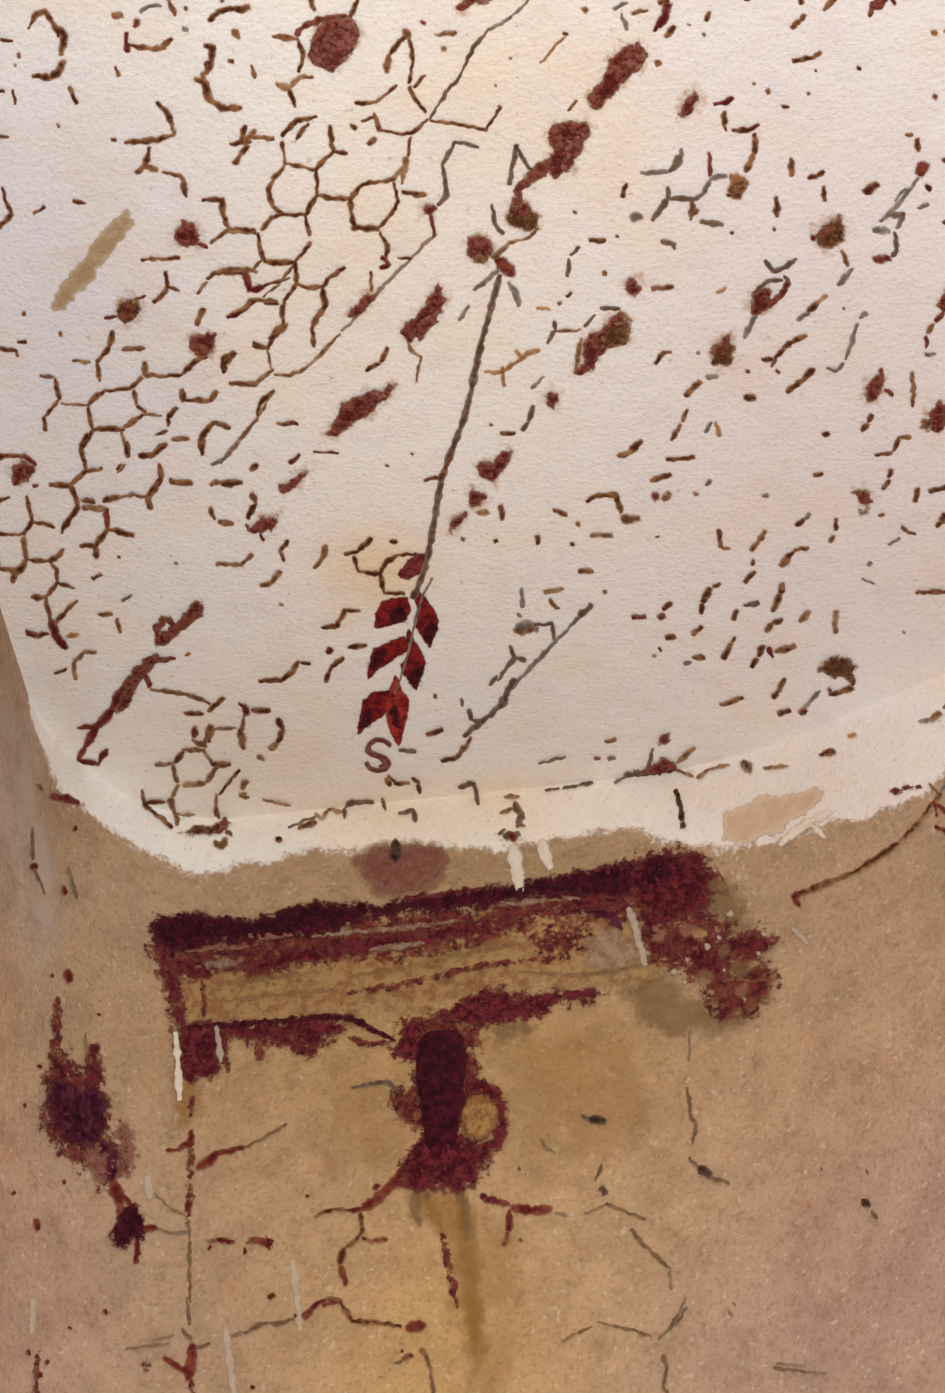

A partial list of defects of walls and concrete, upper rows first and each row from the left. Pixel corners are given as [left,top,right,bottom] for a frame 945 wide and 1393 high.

crack [640,96,760,250]
crack [872,133,945,264]
crack [0,0,479,680]
crack [141,661,418,830]
crack [489,601,560,718]
crack [538,747,788,792]
corrosion [771,655,858,717]
corrosion [144,838,640,1033]
spalling [622,787,824,1027]
spalling [37,996,128,1194]
corrosion [347,1007,510,1199]
crack [125,1095,436,1393]